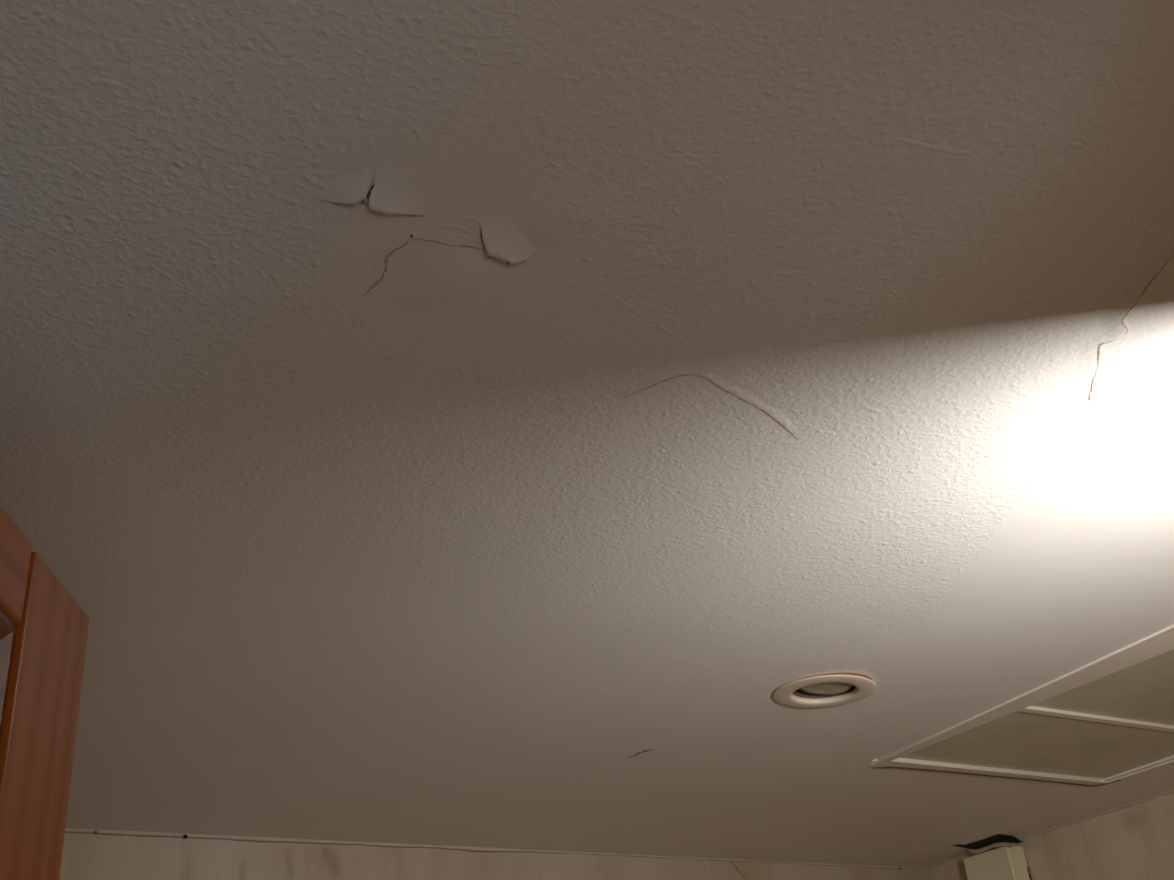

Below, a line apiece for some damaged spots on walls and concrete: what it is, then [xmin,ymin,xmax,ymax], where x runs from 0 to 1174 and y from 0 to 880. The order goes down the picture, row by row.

peeling [319,167,426,217]
peeling [479,214,538,266]